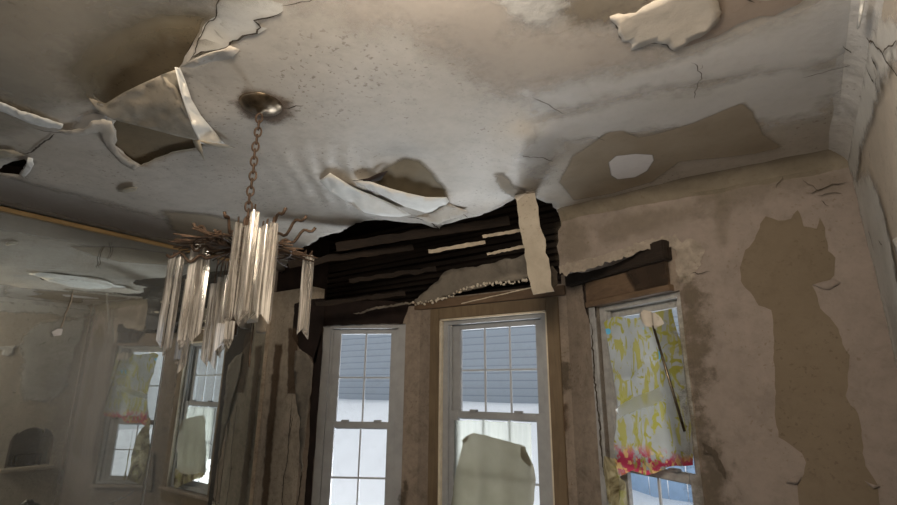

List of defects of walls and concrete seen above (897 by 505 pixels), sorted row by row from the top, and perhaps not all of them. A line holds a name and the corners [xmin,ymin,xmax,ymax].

peeling [98,0,283,103]
peeling [610,0,803,51]
crack [804,39,897,91]
spalling [0,149,34,177]
peeling [114,121,203,165]
spalling [276,199,530,505]
peeling [740,210,880,505]